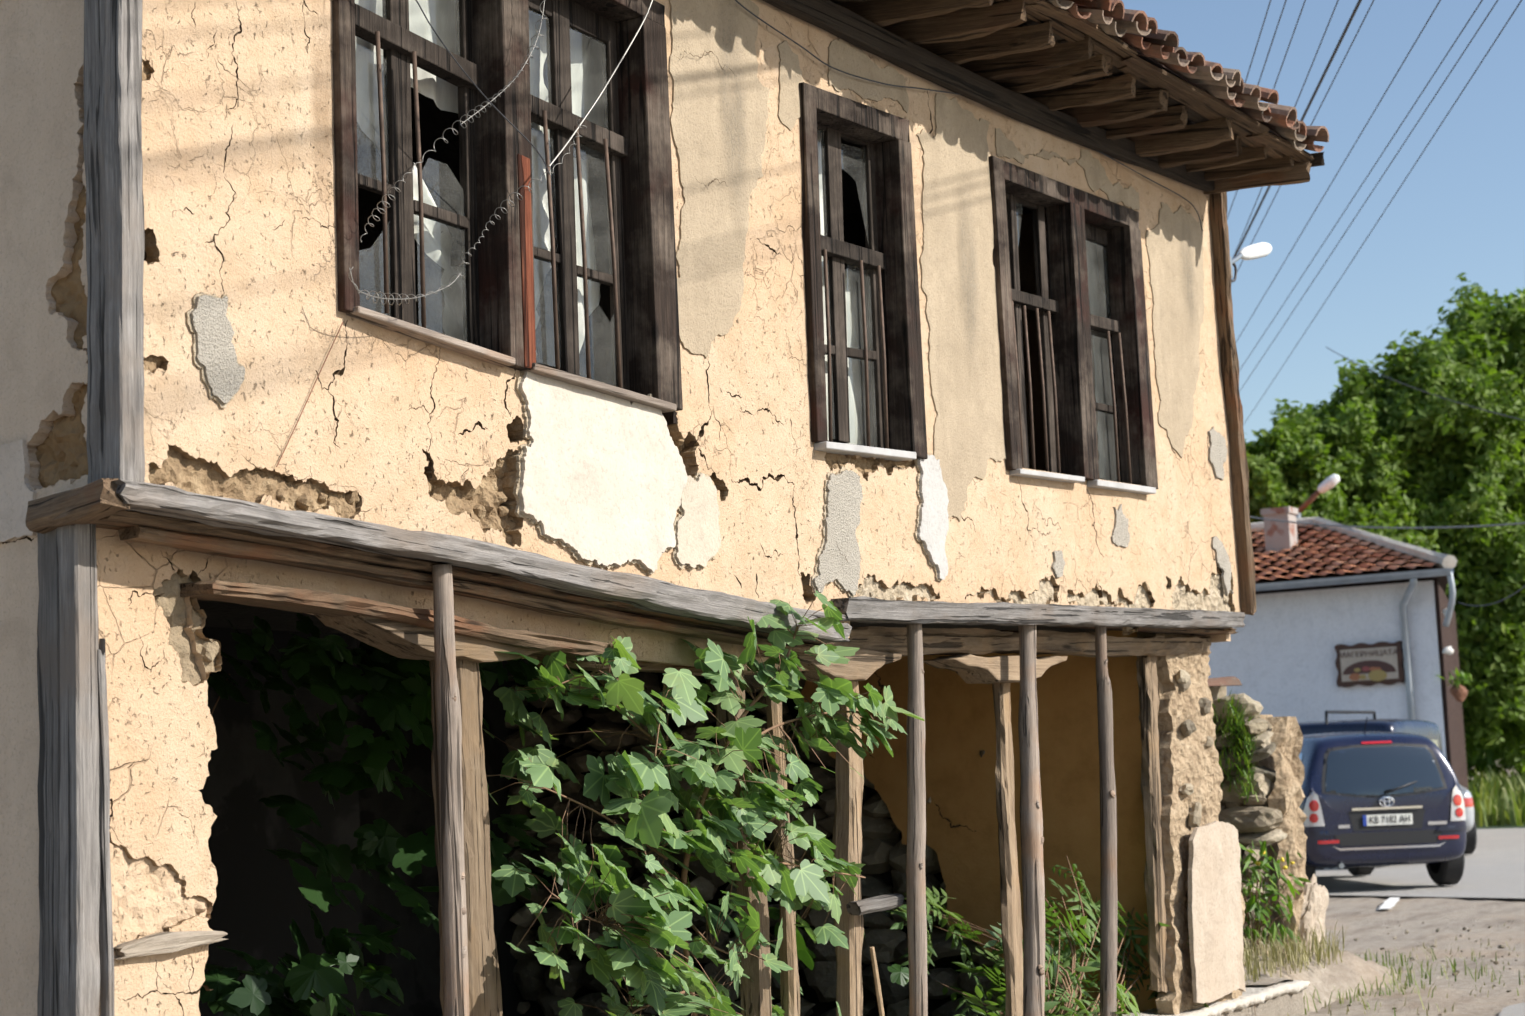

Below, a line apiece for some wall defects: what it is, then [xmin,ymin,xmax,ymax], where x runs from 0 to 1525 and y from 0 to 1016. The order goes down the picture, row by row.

crack [302,0,317,50]
crack [175,2,242,292]
spalling [148,443,362,519]
crack [316,321,347,448]
crack [410,348,516,479]
peeling [422,371,721,575]
crack [687,361,799,598]
peeling [811,93,1140,601]
spalling [152,569,222,686]
spalling [965,536,1235,631]
spalling [110,833,213,945]
crack [118,958,213,1016]